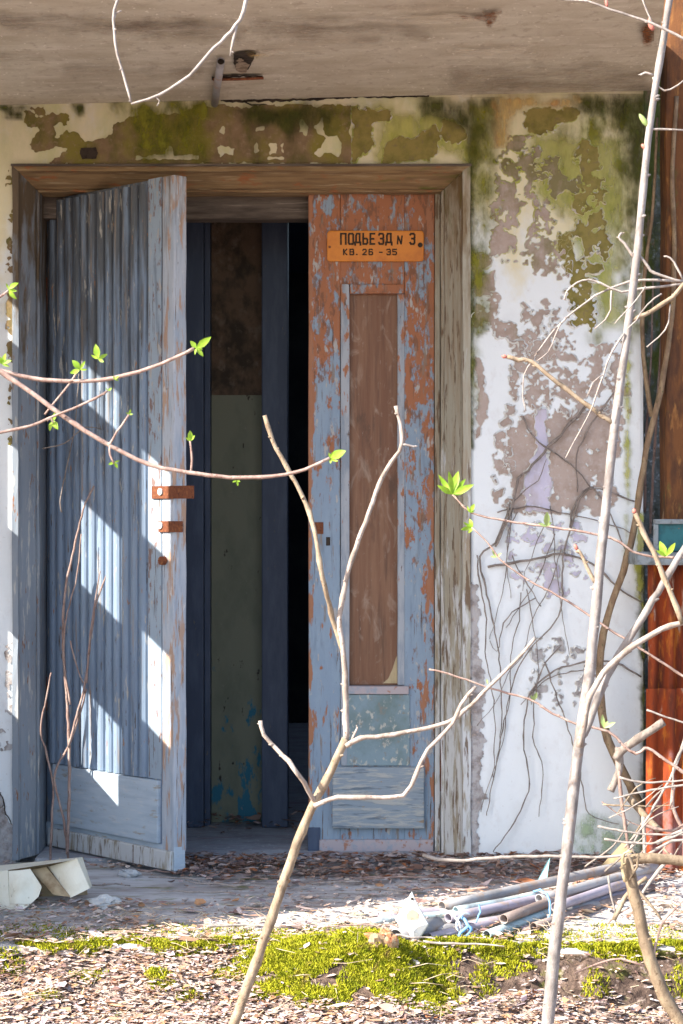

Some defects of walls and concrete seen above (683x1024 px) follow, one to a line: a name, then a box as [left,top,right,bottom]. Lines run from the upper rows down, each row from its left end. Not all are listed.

peeling [24,104,468,164]
damp [468,128,484,167]
peeling [471,106,632,599]